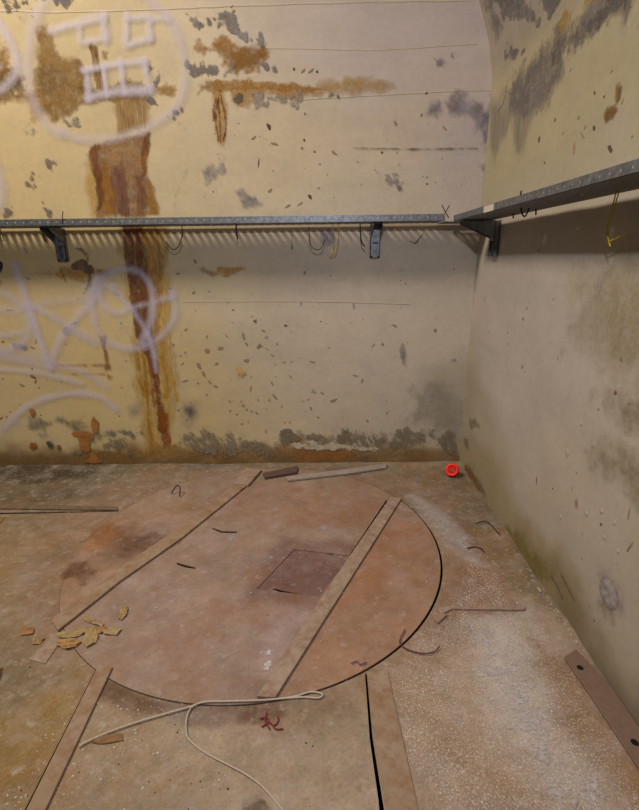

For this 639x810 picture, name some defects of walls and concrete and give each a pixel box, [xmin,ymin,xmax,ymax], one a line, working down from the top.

peeling [184,60,234,77]
peeling [187,5,265,47]
rust [196,36,385,142]
leakage [492,0,630,140]
rust [89,97,177,461]
leakage [0,426,467,465]